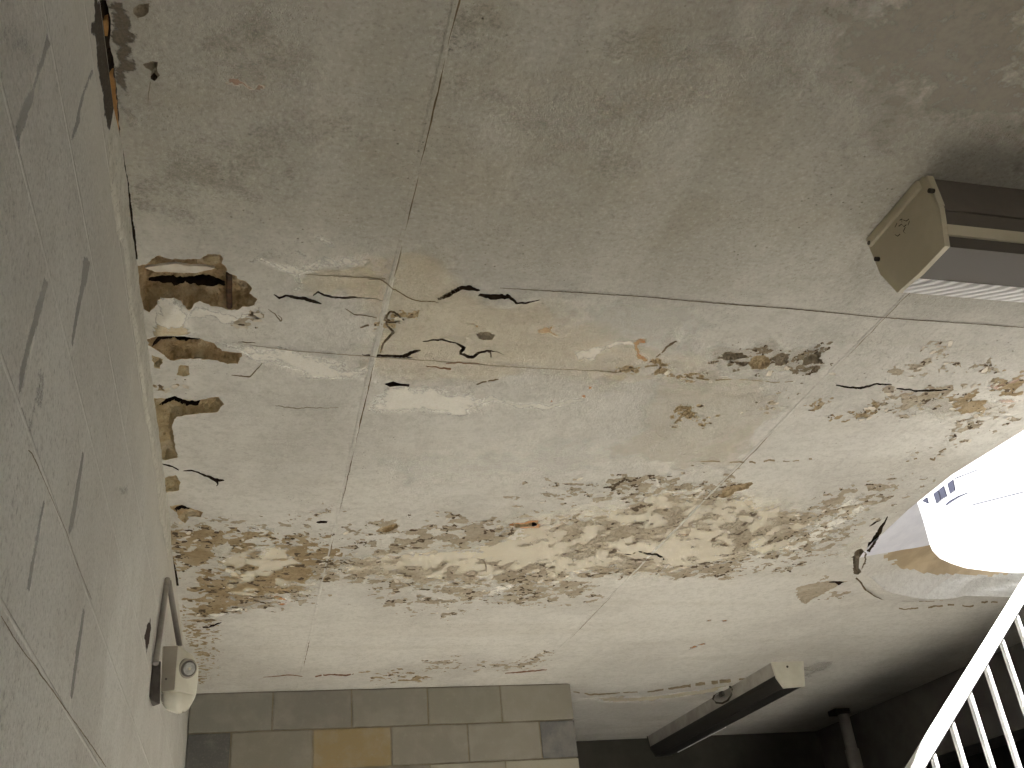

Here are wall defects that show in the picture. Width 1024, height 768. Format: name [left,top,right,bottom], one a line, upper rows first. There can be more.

spalling [138,254,264,329]
crack [232,274,1024,385]
spalling [147,336,242,460]
peeling [615,340,1024,457]
crack [836,383,949,392]
spalling [165,475,181,493]
crack [163,464,224,493]
peeling [170,463,936,685]